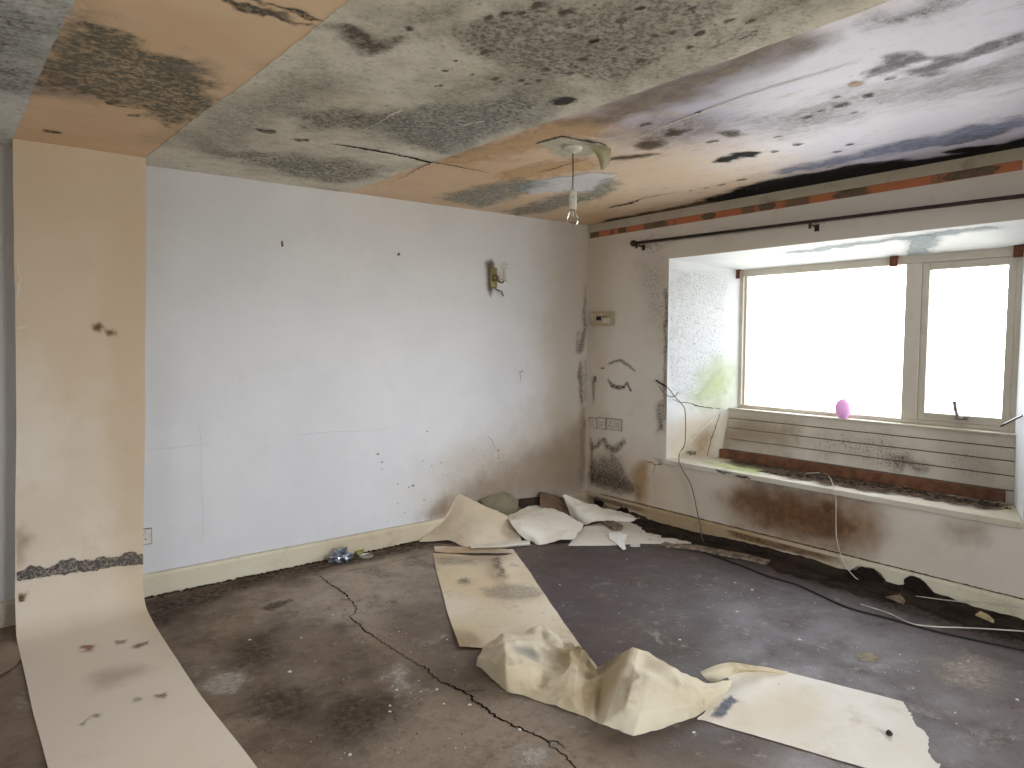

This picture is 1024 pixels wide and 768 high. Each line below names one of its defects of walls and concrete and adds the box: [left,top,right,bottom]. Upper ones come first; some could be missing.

damp [0,0,816,164]
damp [789,94,874,124]
damp [868,34,1024,80]
damp [231,153,380,183]
crack [335,144,488,179]
damp [445,159,619,215]
damp [602,121,1024,223]
damp [590,438,644,511]
flaking render [609,532,640,550]
crack [320,576,576,768]